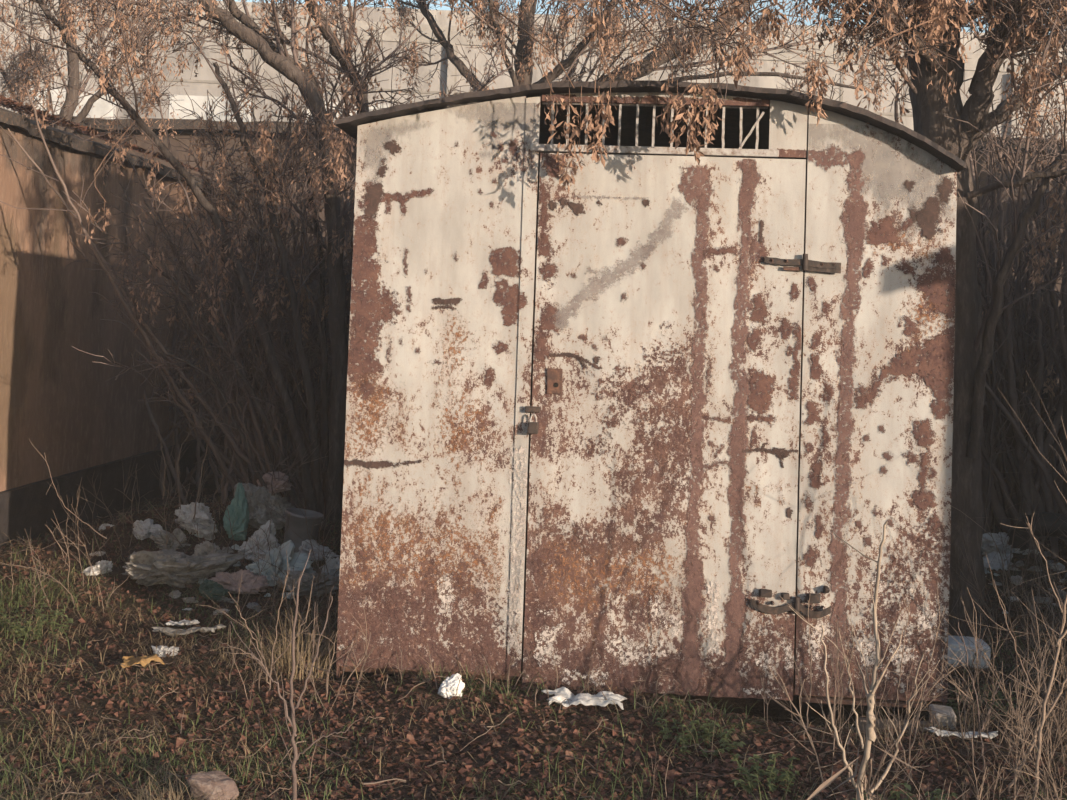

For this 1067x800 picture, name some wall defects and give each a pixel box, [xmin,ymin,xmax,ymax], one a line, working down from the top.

rust [336,140,954,701]